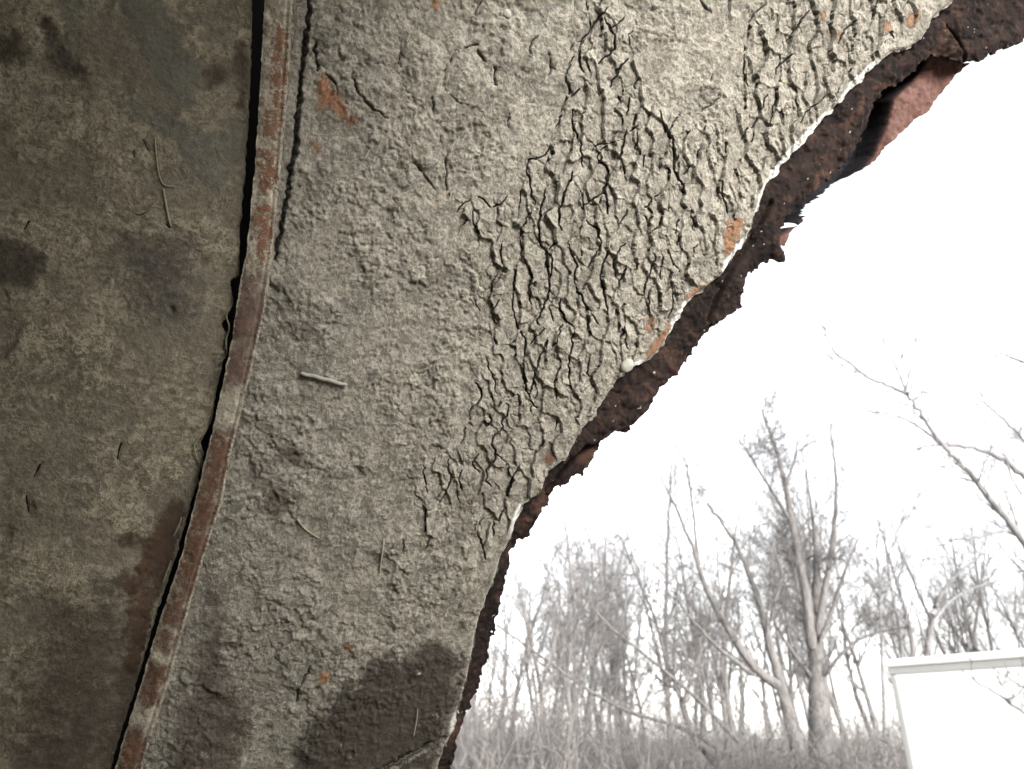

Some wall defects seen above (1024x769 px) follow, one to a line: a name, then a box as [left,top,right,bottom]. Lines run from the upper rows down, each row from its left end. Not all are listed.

corrosion [250,22,289,267]
crack [274,0,388,260]
crack [741,10,809,140]
crack [414,1,720,559]
peeling [403,0,931,565]
corrosion [122,428,235,708]
leakage [293,639,465,769]